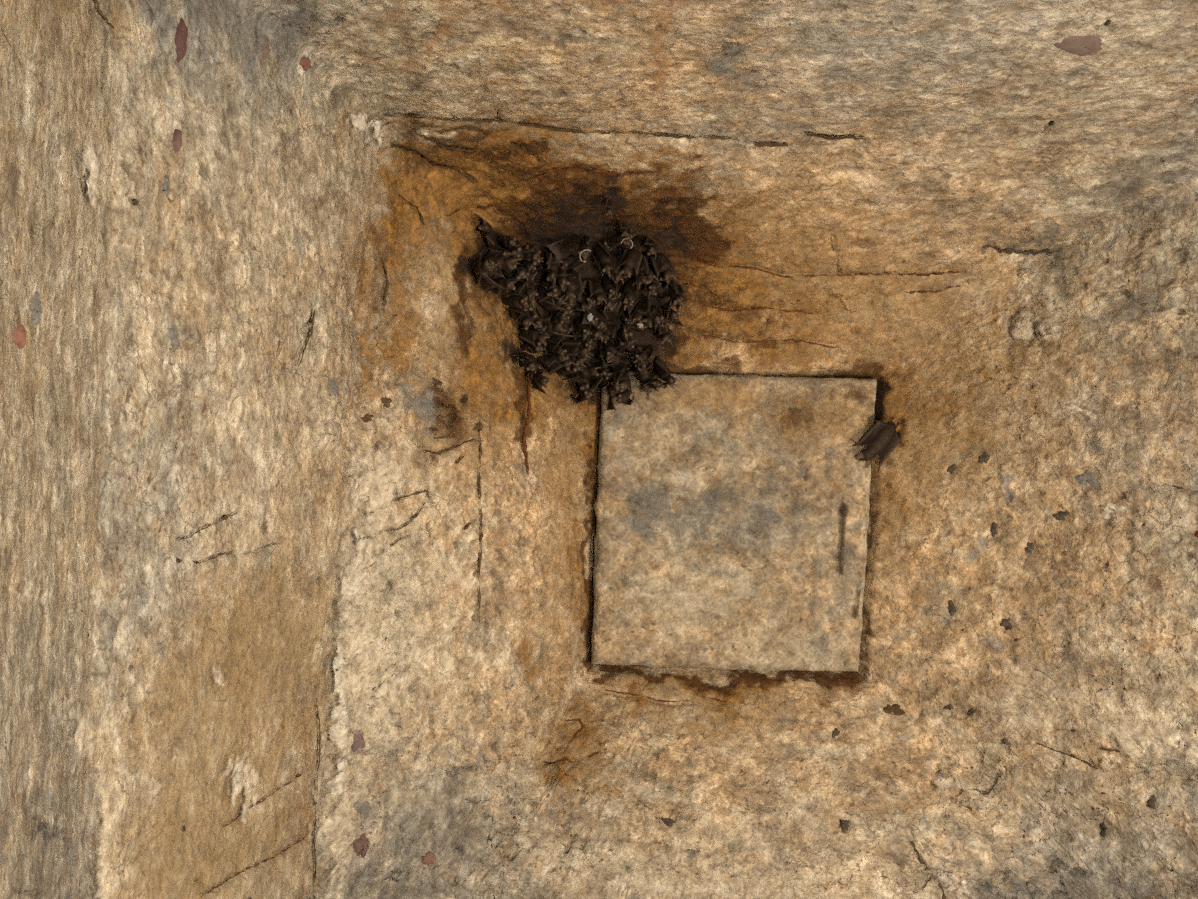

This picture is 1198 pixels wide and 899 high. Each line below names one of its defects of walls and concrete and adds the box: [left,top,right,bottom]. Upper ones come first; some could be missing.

crack [95,0,115,29]
corrosion [351,119,873,718]
corrosion [814,360,953,447]
corrosion [867,499,878,551]